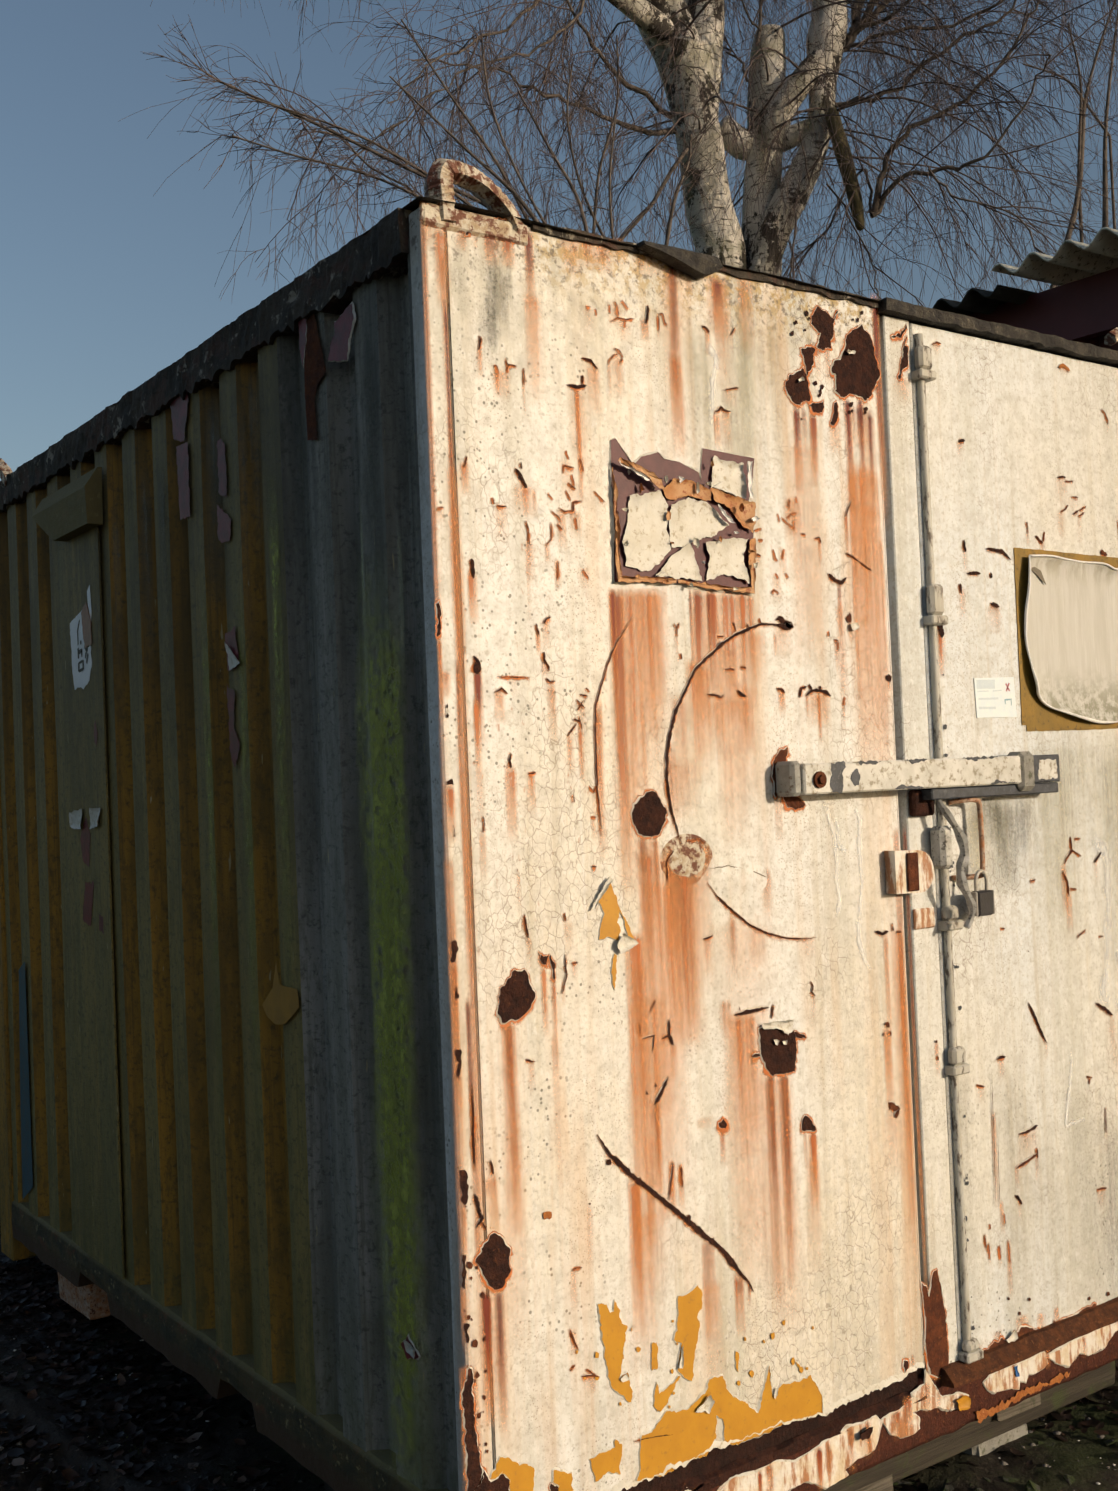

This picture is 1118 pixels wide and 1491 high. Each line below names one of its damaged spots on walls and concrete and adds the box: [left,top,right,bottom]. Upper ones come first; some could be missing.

rust [784,298,909,511]
peeling [609,437,761,596]
water stain [371,649,415,1397]
rust [495,952,556,1183]
peeling [590,876,639,990]
rust [610,591,691,1133]
rust [745,1019,817,1226]
rust [460,1231,513,1491]
peeling [468,1435,574,1491]
peeling [576,1284,823,1482]
rust [611,1268,949,1491]
peeling [685,1322,1118,1491]